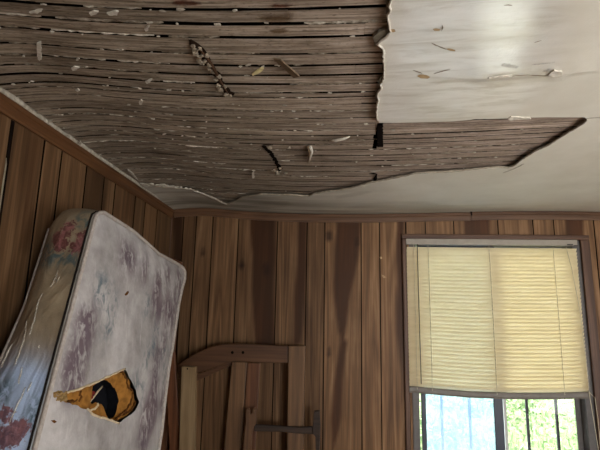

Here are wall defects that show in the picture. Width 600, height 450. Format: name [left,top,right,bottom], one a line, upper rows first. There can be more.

flaking render [373,0,396,147]
crack [261,145,291,175]
flaking render [0,87,587,205]